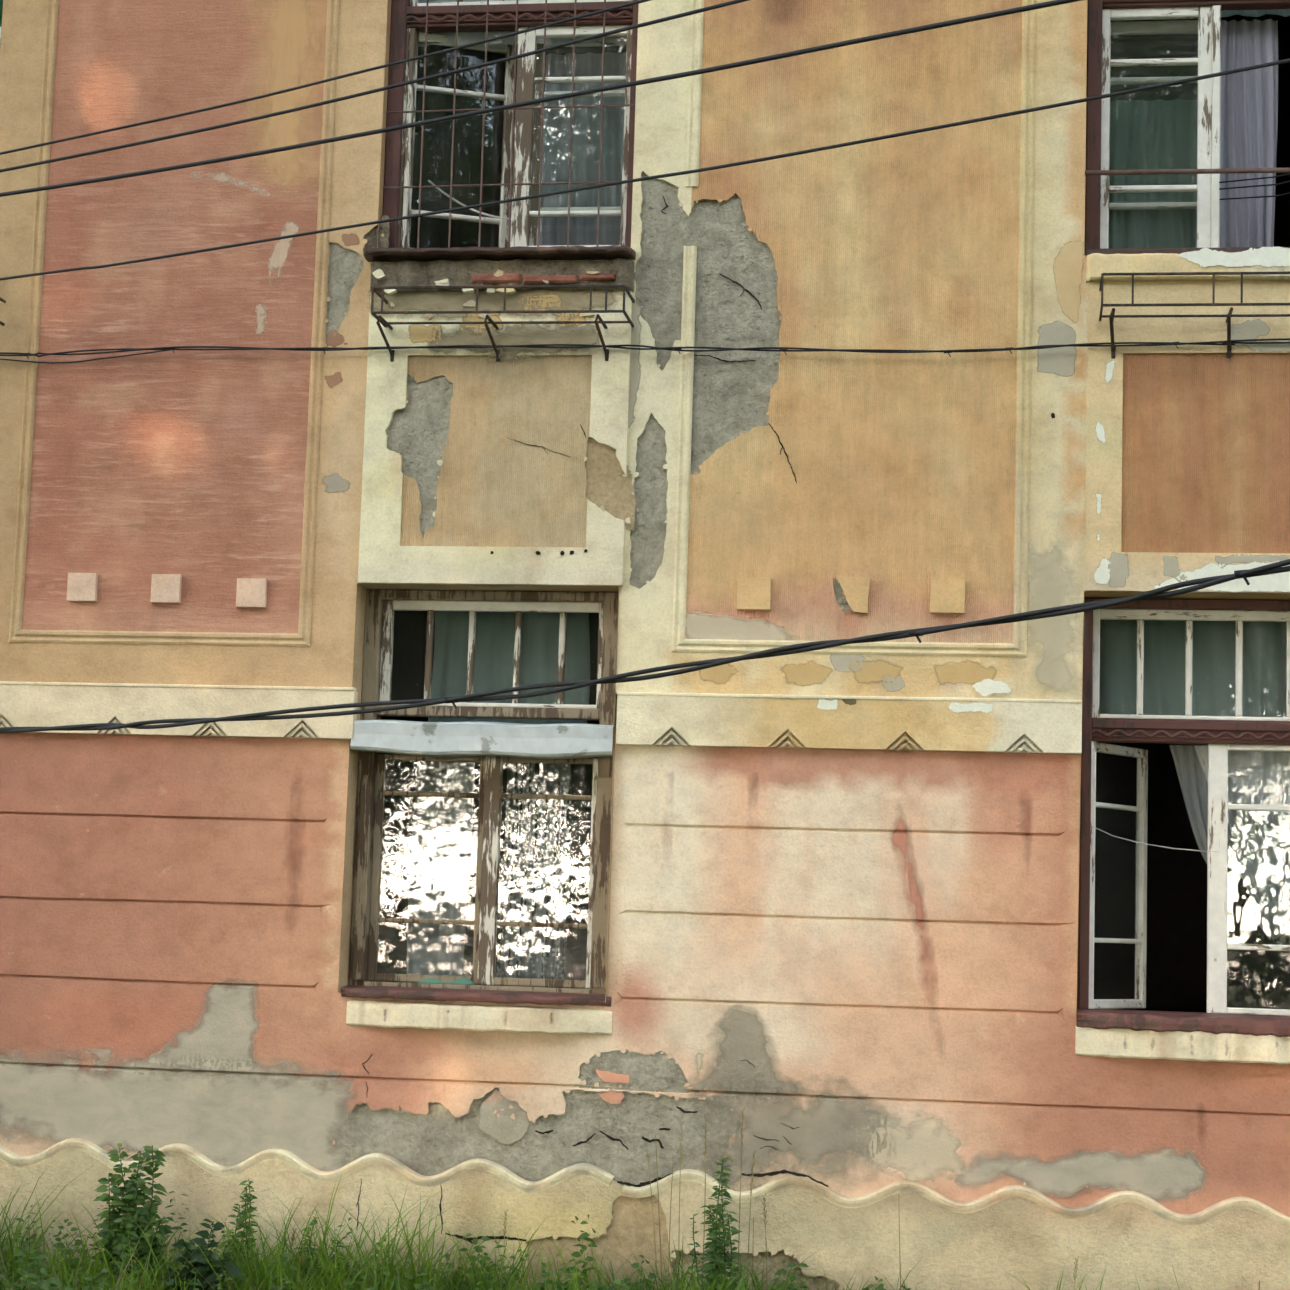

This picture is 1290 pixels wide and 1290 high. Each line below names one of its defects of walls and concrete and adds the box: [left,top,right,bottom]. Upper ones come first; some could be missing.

peeling [325,215,390,347]
peeling [635,172,782,475]
peeling [1179,247,1290,267]
peeling [386,374,453,536]
crack [506,424,586,457]
peeling [584,413,668,589]
crack [768,423,797,483]
peeling [1153,554,1290,592]
peeling [700,664,737,684]
damp [893,821,928,960]
peeling [333,1049,843,1290]
damp [690,1008,1205,1200]